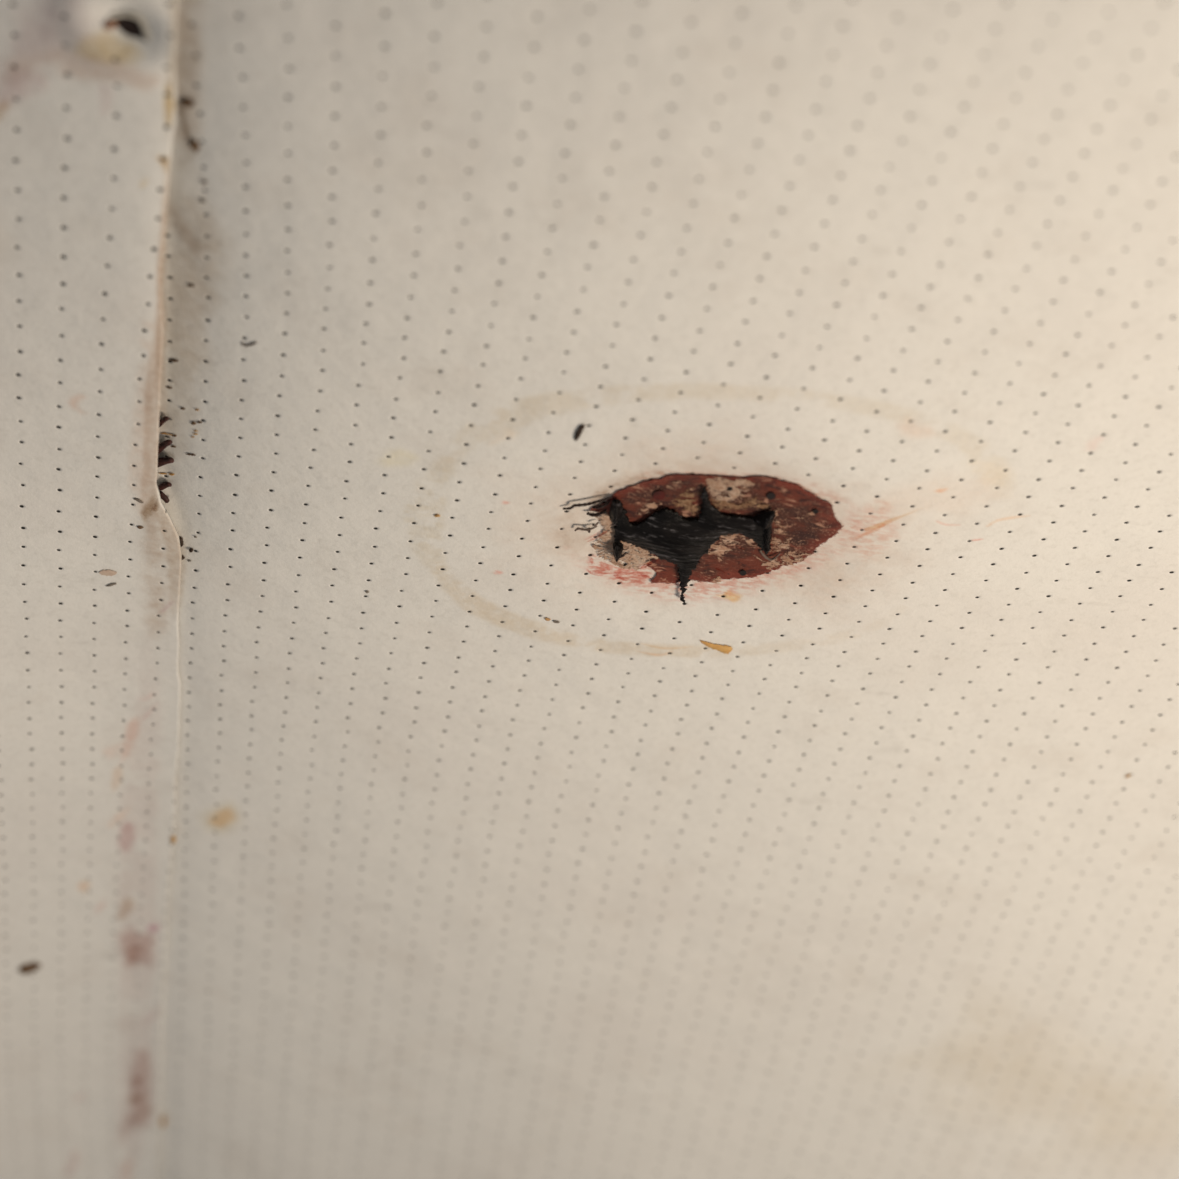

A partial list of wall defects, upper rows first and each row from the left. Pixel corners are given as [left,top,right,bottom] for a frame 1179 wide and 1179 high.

peeling [593,514,658,571]
peeling [639,477,822,570]